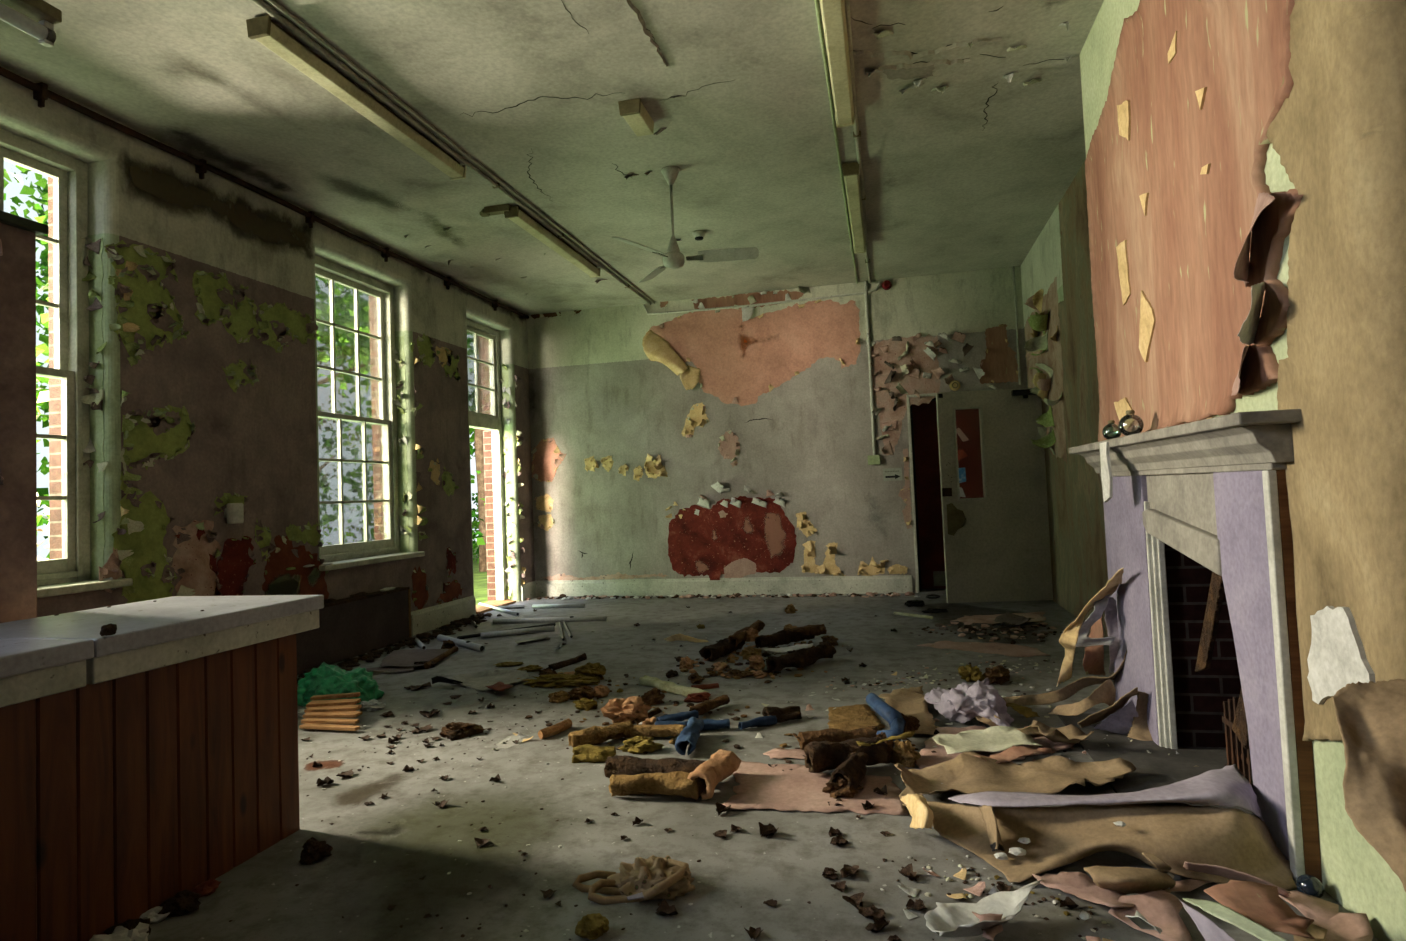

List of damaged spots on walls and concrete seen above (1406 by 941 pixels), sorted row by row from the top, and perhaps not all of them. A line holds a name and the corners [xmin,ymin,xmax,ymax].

crack [626,0,733,99]
crack [460,93,613,117]
water stain [122,155,312,259]
water stain [175,131,285,189]
peeling [80,237,329,604]
peeling [642,287,997,529]
flaking render [498,364,908,599]
flaking render [1307,606,1375,704]